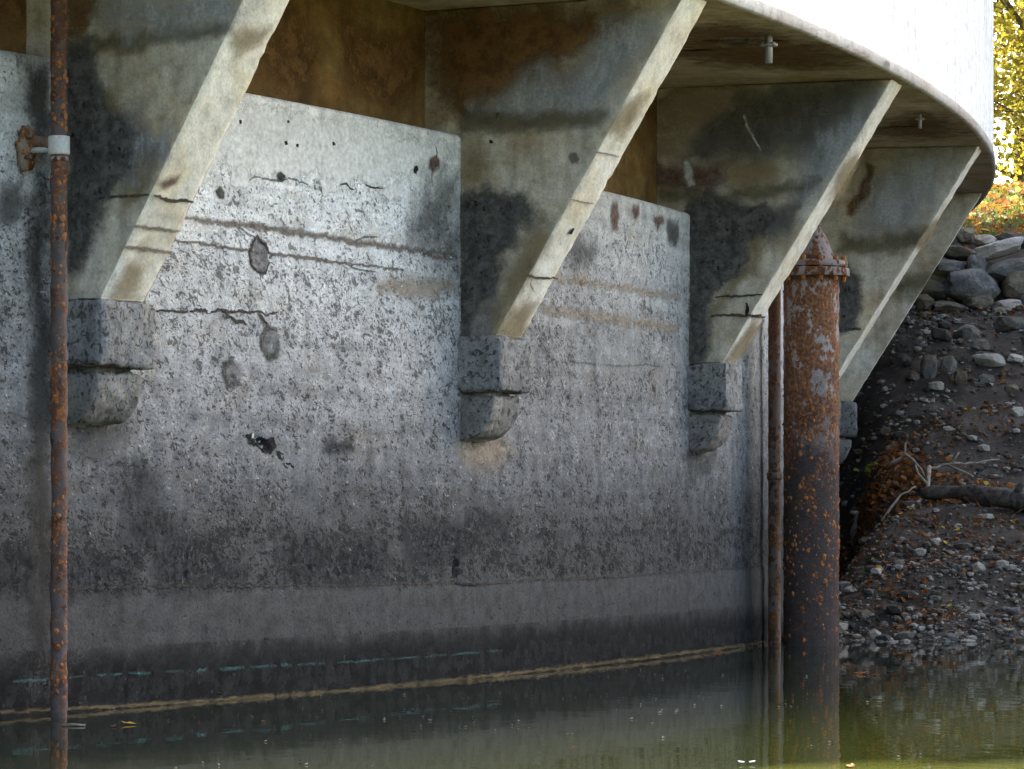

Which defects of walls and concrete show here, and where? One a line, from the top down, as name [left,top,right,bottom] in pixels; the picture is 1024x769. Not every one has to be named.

crack [249,176,308,185]
crack [340,182,383,190]
rust [835,155,875,216]
rust [611,204,619,231]
crack [102,193,456,272]
crack [156,308,277,331]
crack [710,294,765,318]
spalling [246,433,294,468]